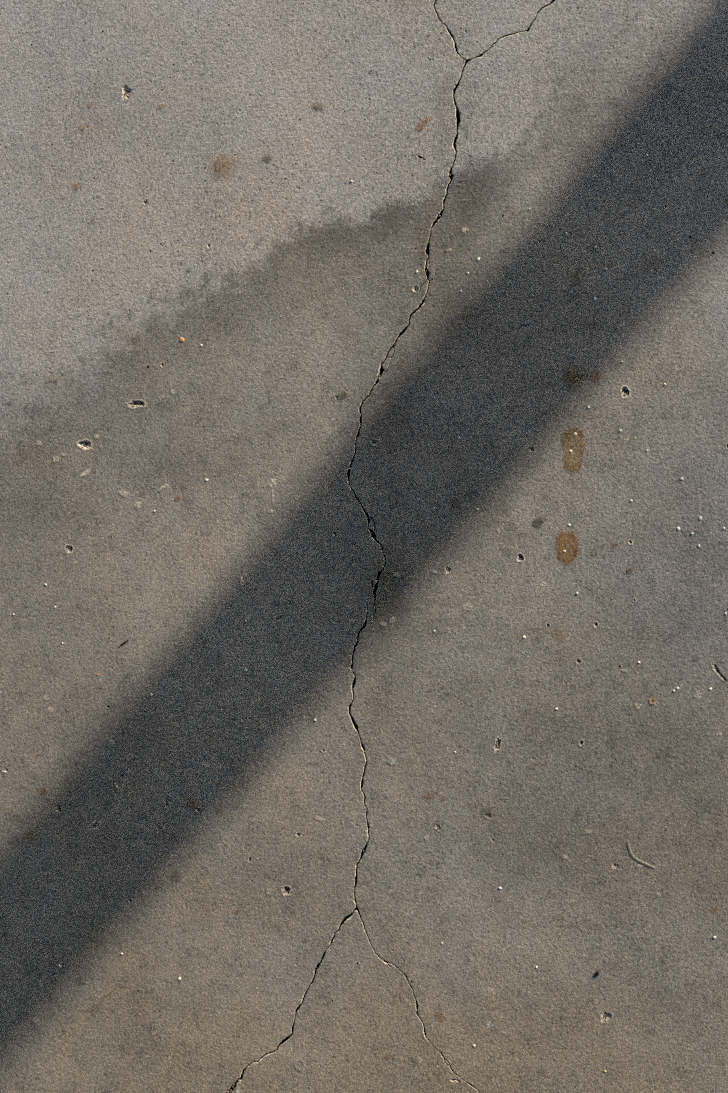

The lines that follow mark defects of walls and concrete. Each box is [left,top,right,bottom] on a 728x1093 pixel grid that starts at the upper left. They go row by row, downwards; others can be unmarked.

water stain [564,434,583,470]
crack [226,0,556,1093]
water stain [558,534,578,561]